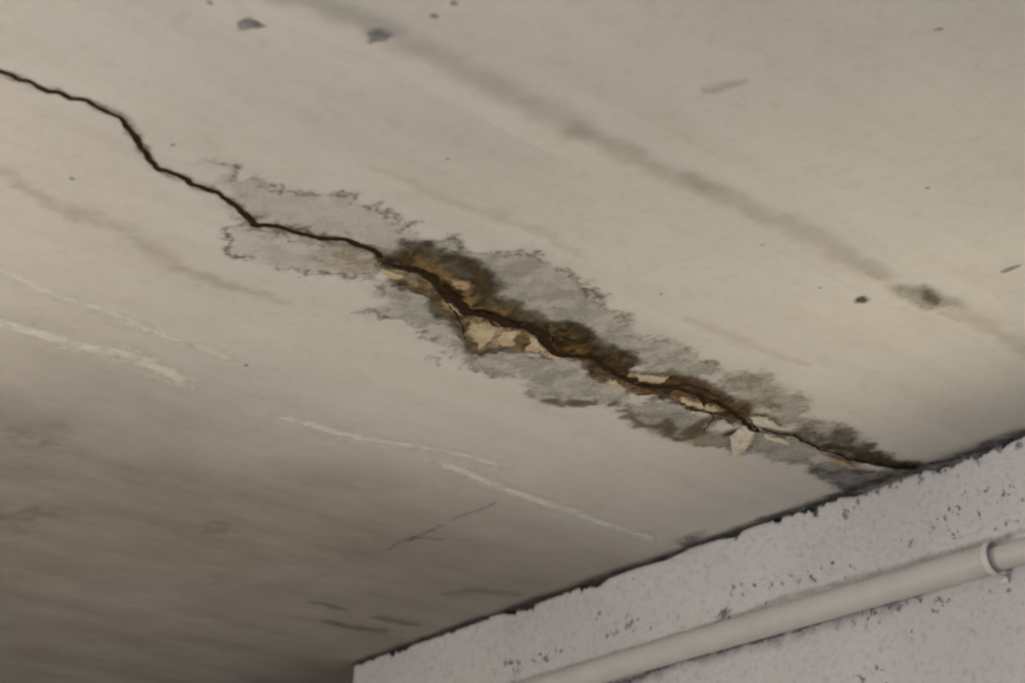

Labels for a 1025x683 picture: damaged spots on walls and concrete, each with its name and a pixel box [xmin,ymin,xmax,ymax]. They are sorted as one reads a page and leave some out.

crack [0,70,917,470]
spalling [376,242,795,459]